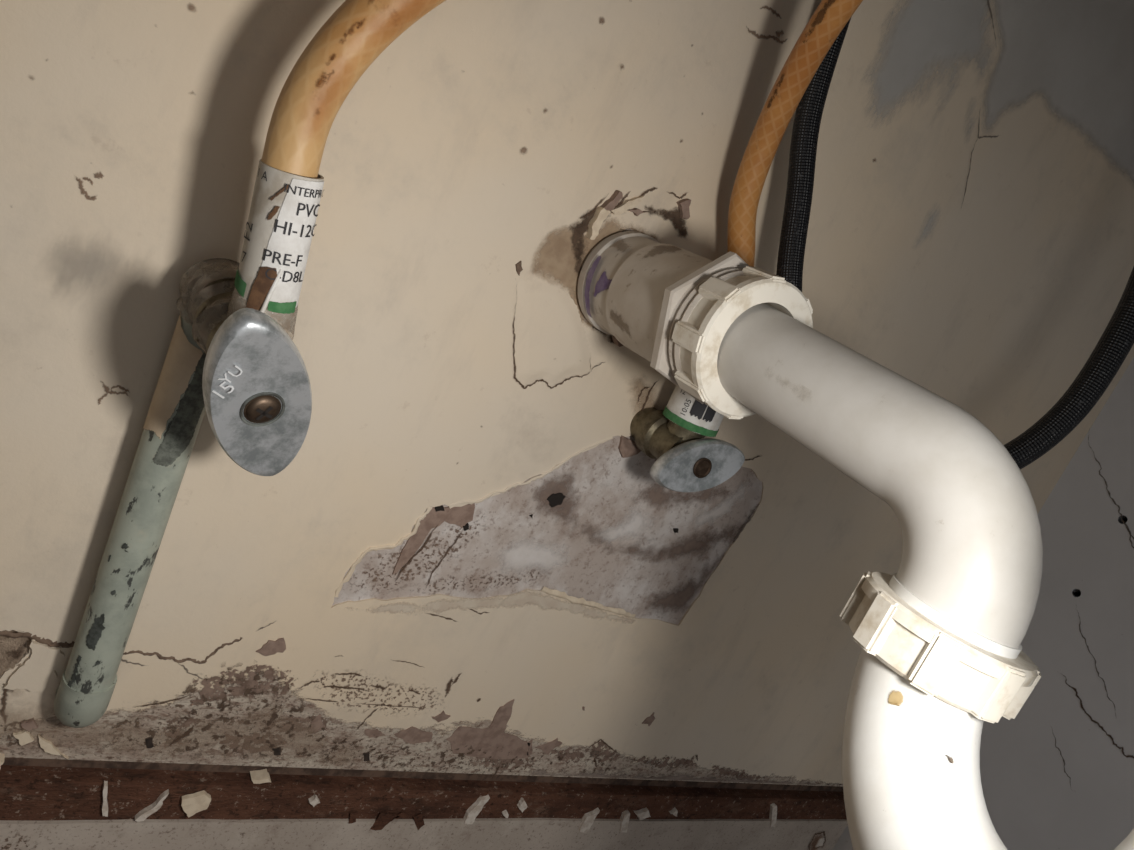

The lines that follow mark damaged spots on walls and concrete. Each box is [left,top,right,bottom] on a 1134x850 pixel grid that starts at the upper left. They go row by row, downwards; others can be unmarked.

spalling [534,187,691,347]
peeling [332,435,763,625]
crack [1088,437,1134,548]
crack [0,684,29,726]
spalling [0,613,105,692]
crack [121,623,273,680]
peeling [0,638,843,787]
crack [1063,613,1134,758]